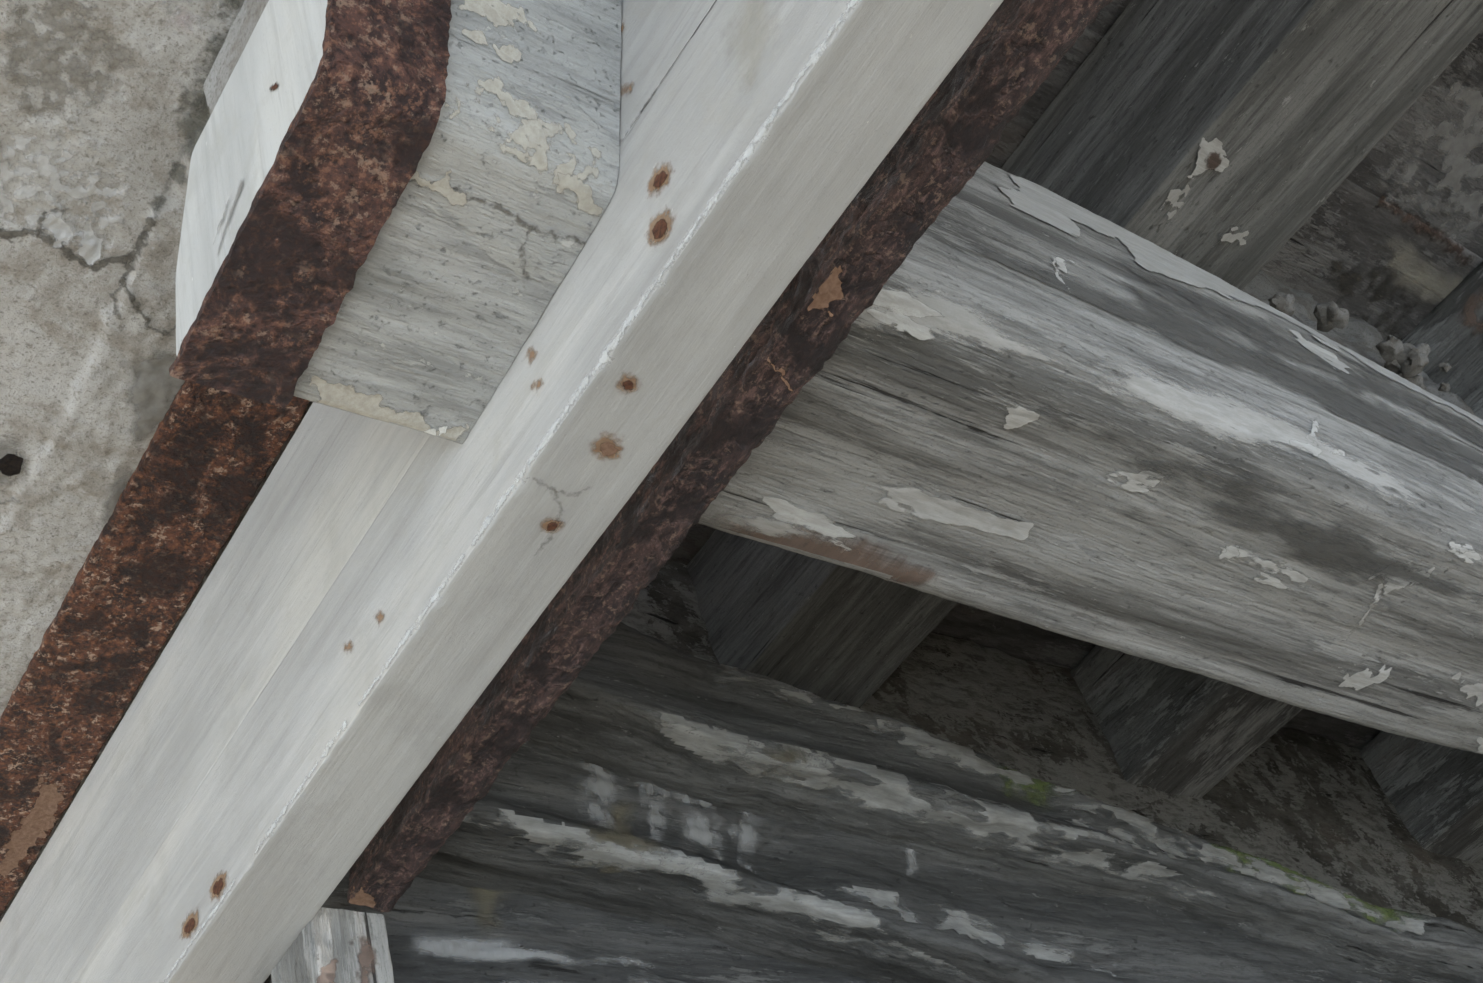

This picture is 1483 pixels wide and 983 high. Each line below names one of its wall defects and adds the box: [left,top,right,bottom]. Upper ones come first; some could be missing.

corrosion [1187,137,1230,179]
corrosion [648,166,671,193]
corrosion [648,210,674,245]
crack [0,208,176,336]
peeling [853,287,1058,362]
peeling [971,175,1483,505]
peeling [1107,448,1462,637]
peeling [1448,541,1481,563]
peeling [1339,664,1392,691]
corrosion [0,777,65,880]
corrosion [210,873,226,900]
corrosion [181,910,198,938]